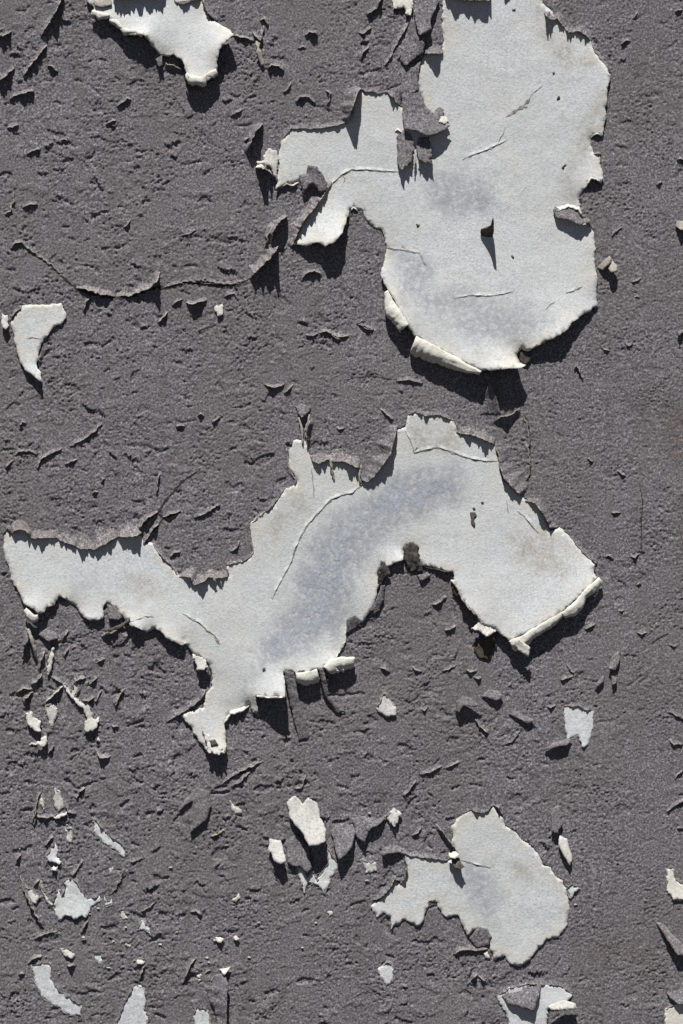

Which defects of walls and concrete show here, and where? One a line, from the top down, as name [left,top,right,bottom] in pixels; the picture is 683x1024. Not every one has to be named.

peeling [0,0,620,759]
crack [272,468,362,599]
peeling [18,954,83,1017]
peeling [24,786,155,968]
peeling [268,774,402,895]
peeling [361,804,579,1024]